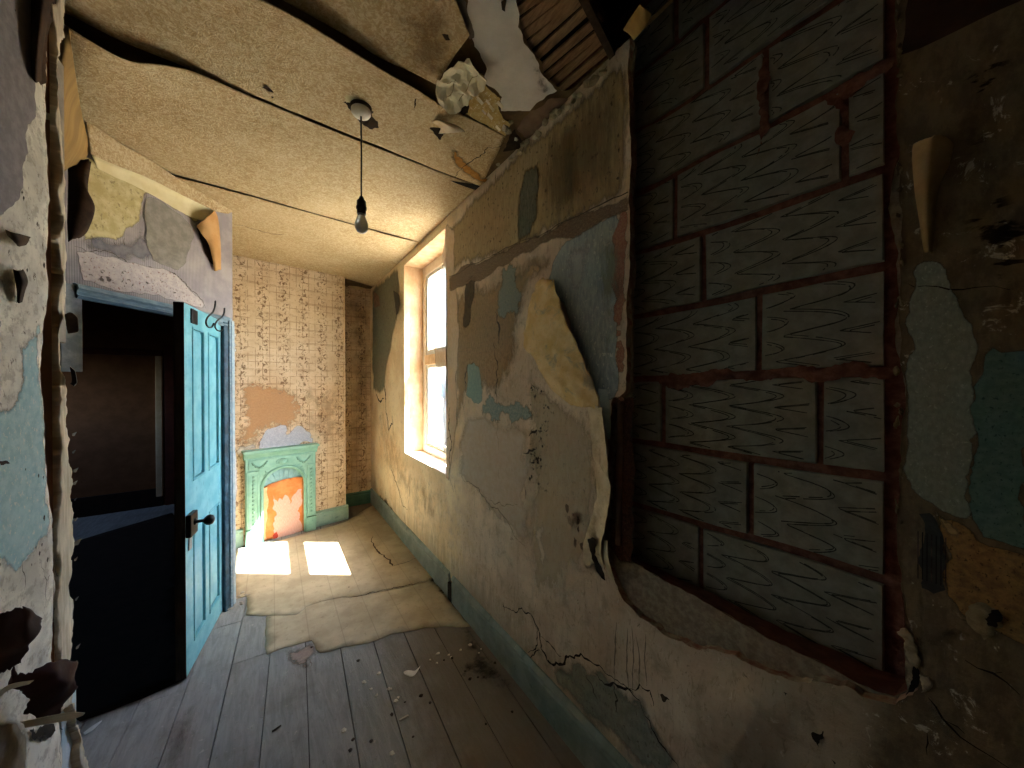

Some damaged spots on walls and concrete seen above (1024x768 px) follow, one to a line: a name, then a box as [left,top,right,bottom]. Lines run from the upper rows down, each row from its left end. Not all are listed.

peeling [0,0,57,214]
peeling [430,120,465,140]
flaking render [457,0,568,152]
peeling [5,230,31,247]
peeling [13,268,28,303]
peeling [0,321,49,571]
peeling [372,270,400,392]
flaking render [433,226,532,478]
flaking render [549,39,933,705]
flaking render [887,156,1024,644]
flaking render [30,724,55,742]
crack [503,605,677,764]